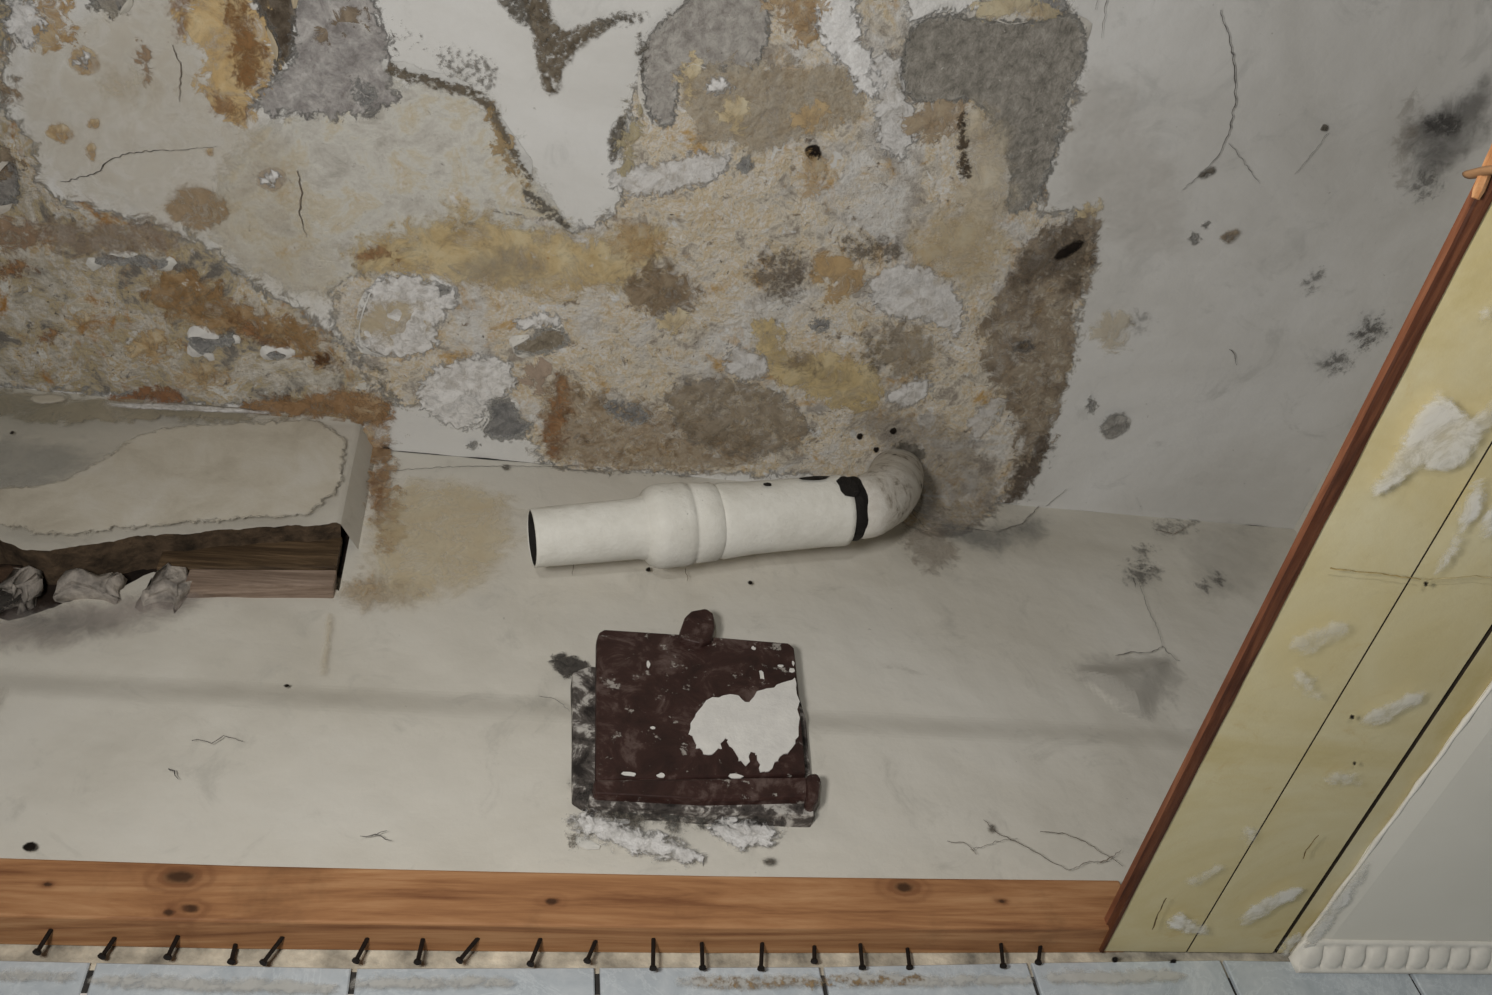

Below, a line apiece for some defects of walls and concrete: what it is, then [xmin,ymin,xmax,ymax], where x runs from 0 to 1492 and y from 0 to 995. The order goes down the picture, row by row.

crack [1185,12,1257,188]
water stain [1418,94,1485,166]
flaking render [0,0,1102,538]
spalling [1085,396,1131,439]